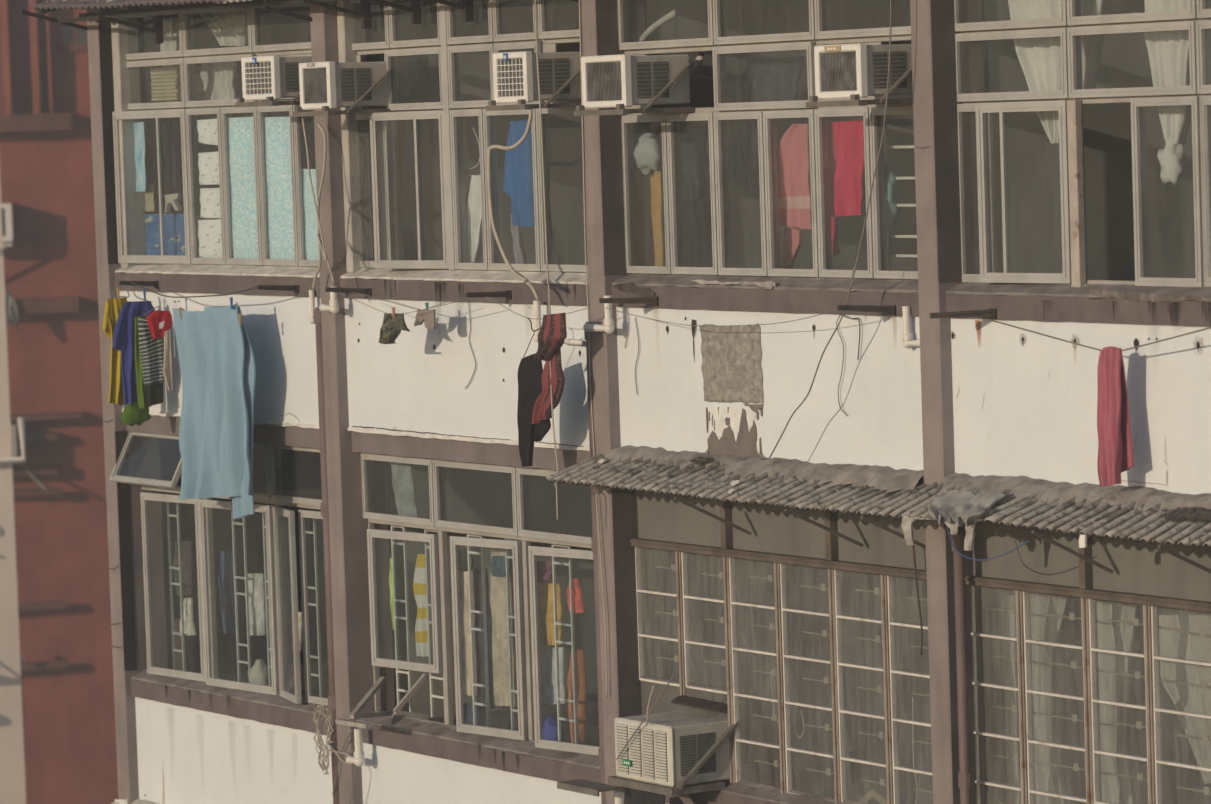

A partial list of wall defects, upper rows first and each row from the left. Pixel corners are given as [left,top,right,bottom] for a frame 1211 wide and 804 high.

peeling [705,404,764,457]